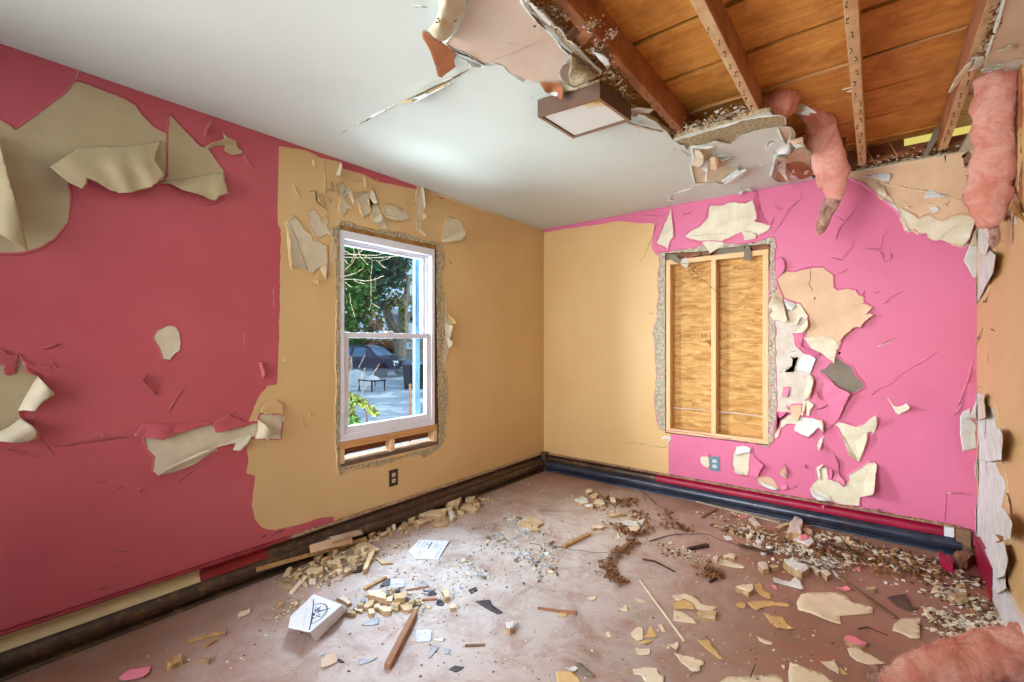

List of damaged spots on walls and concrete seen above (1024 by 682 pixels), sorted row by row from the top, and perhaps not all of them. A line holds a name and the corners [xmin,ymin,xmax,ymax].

peeling [0,70,255,256]
crack [344,69,469,132]
peeling [413,0,611,100]
spalling [631,107,654,117]
peeling [673,114,814,184]
peeling [848,150,997,309]
peeling [0,343,284,477]
peeling [152,325,182,361]
spalling [284,162,544,476]
peeling [640,190,877,509]
peeling [960,386,1014,593]